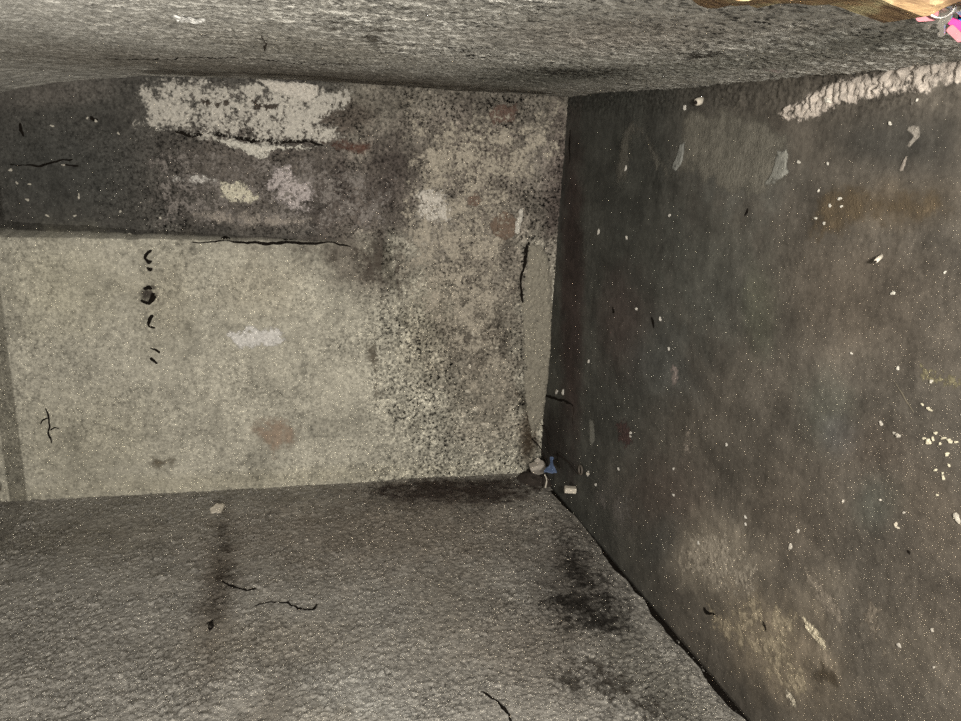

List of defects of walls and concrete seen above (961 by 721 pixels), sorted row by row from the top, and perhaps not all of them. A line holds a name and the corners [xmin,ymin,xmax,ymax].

flaking render [778,61,961,122]
water stain [414,187,452,228]
crack [192,236,351,247]
flaking render [145,97,568,441]
crack [519,242,530,303]
crack [551,490,749,721]
crack [481,691,512,721]